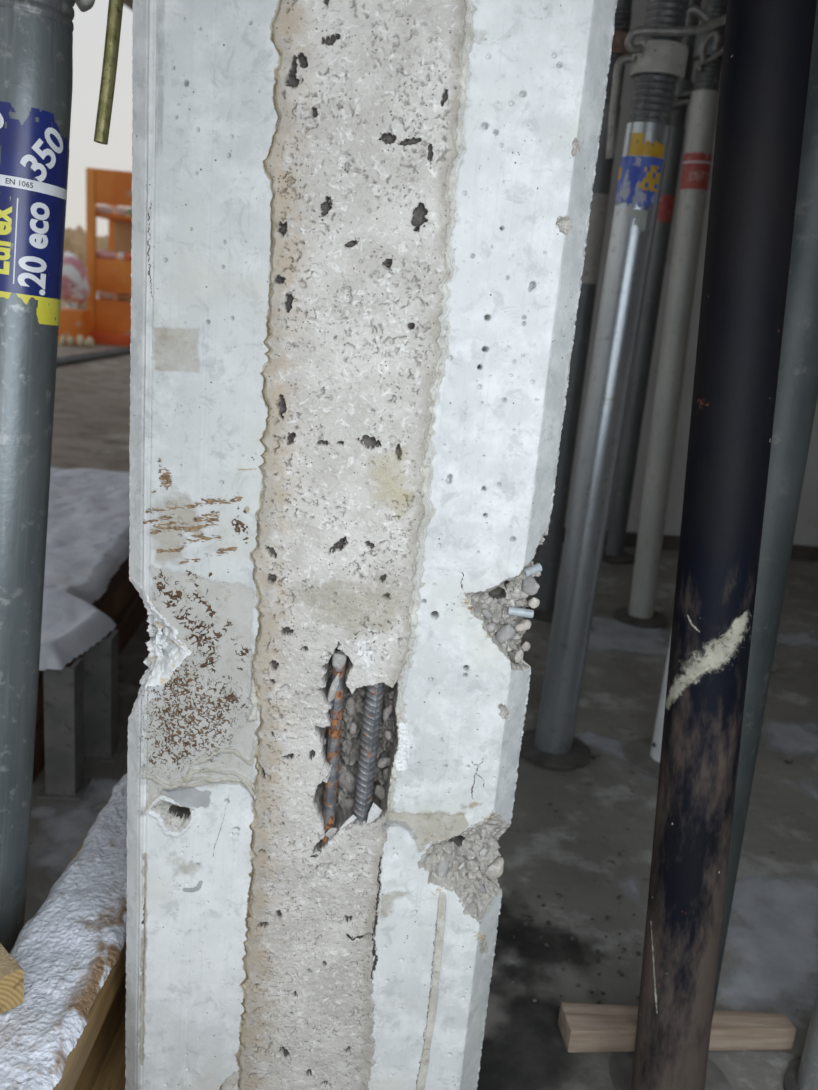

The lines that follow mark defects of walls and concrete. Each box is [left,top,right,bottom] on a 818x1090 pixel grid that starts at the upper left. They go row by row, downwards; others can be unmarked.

rust [143,458,249,564]
spalling [128,577,191,719]
spalling [462,521,550,672]
spalling [313,642,399,854]
crack [346,856,382,980]
spalling [417,810,511,939]